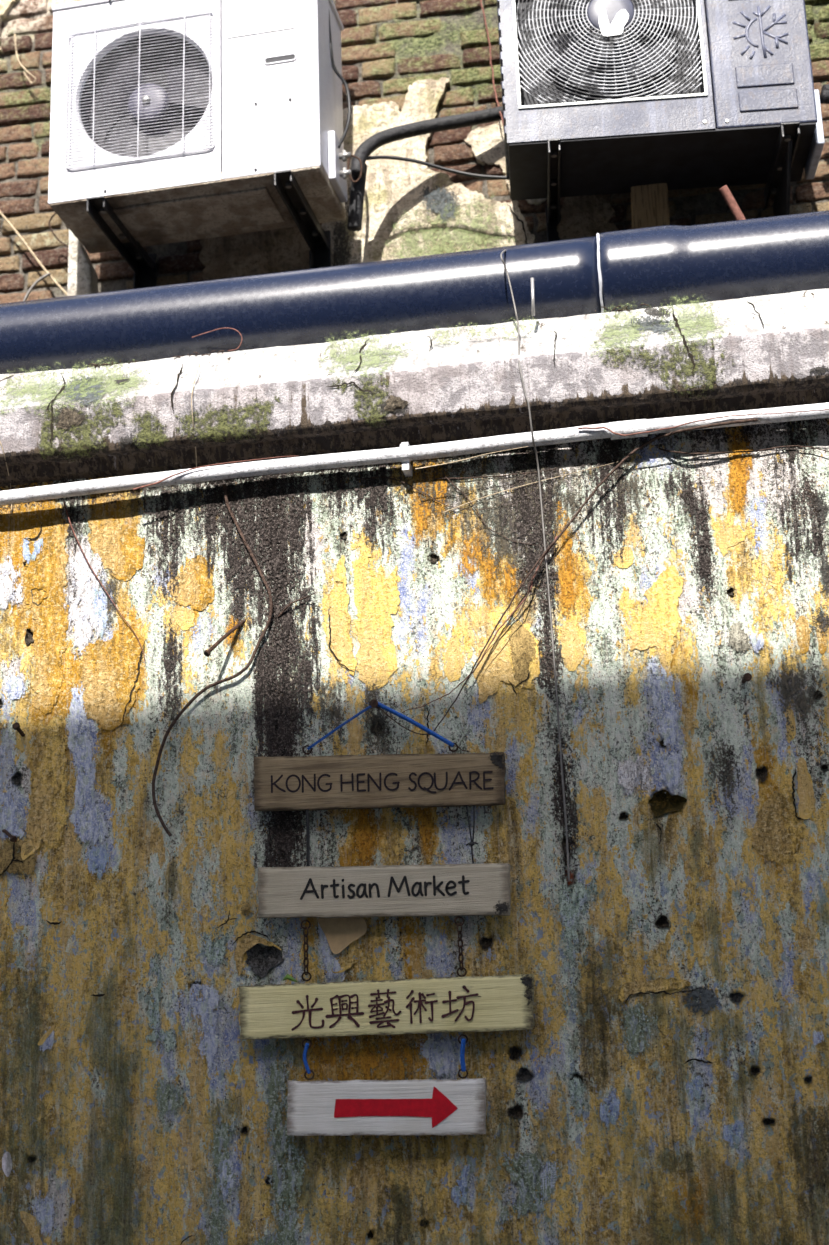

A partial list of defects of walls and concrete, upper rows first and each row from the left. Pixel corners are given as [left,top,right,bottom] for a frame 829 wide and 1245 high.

peeling [599,8,629,36]
water stain [631,305,676,335]
crack [672,310,696,375]
crack [47,374,66,452]
water stain [52,376,130,433]
crack [171,364,183,414]
water stain [664,462,715,603]
peeling [328,532,400,691]
peeling [0,514,145,881]
water stain [143,438,649,902]
peeling [613,565,687,819]
crack [622,987,708,1005]